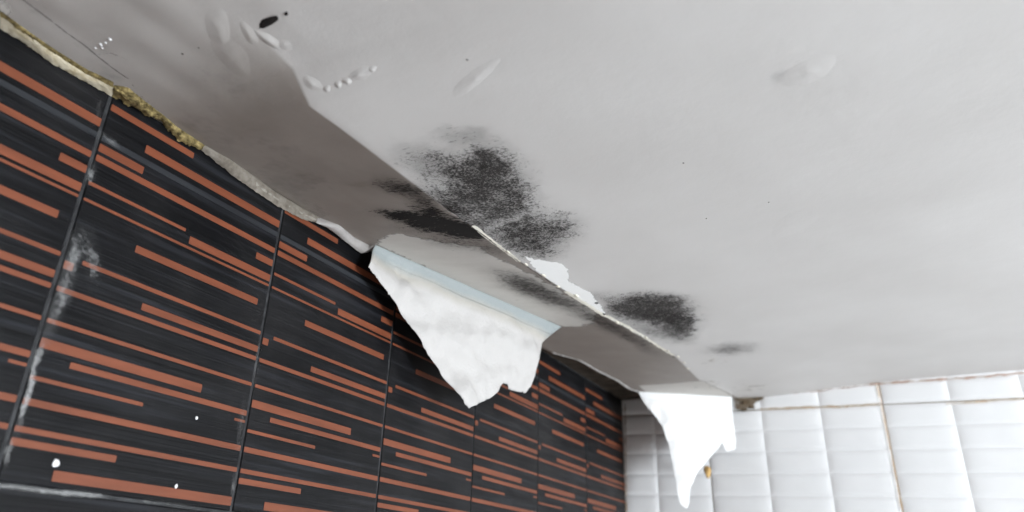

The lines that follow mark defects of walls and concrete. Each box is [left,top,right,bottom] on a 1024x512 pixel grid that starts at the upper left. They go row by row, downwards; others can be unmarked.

peeling [0,11,605,408]
mould [374,145,574,258]
mould [499,273,698,346]
peeling [639,381,736,508]